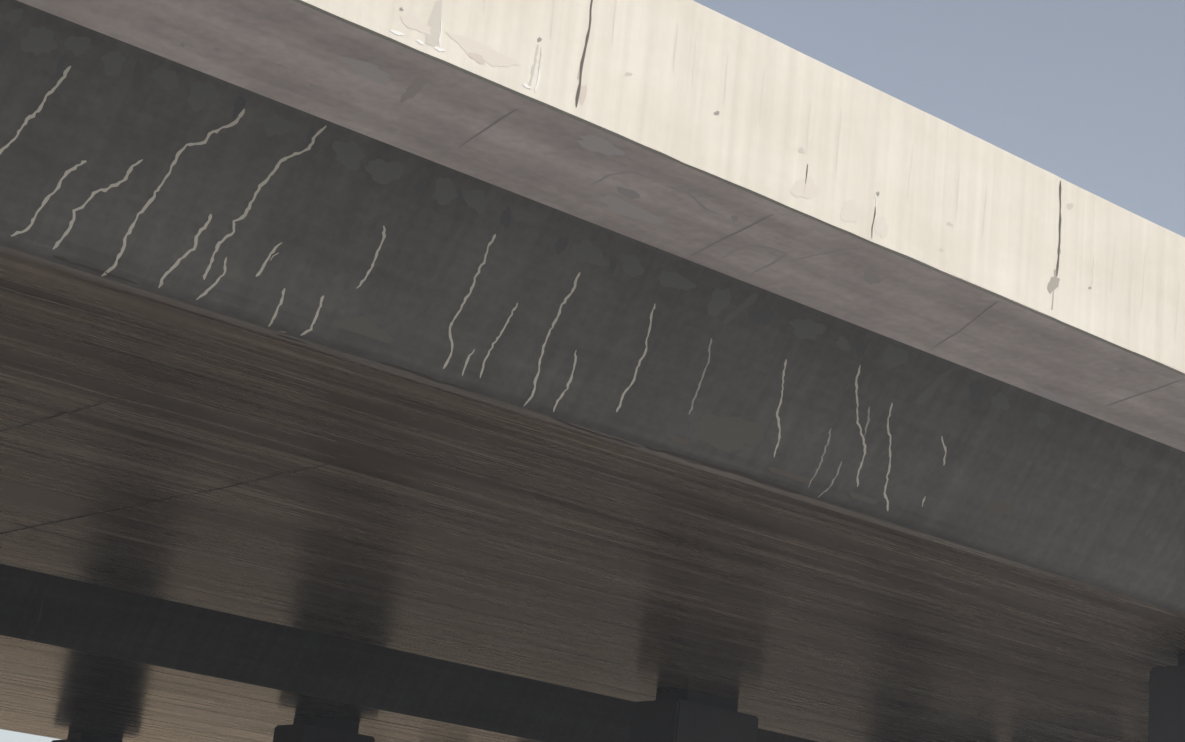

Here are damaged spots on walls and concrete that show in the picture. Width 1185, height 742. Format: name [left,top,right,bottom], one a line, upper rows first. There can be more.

crack [0,66,71,155]
crack [576,0,593,107]
crack [11,159,143,250]
crack [101,109,245,276]
crack [158,126,327,300]
crack [256,242,324,336]
crack [443,234,518,378]
crack [523,272,580,412]
crack [616,304,655,412]
crack [774,359,787,457]
crack [809,365,893,511]
crack [1051,181,1062,310]